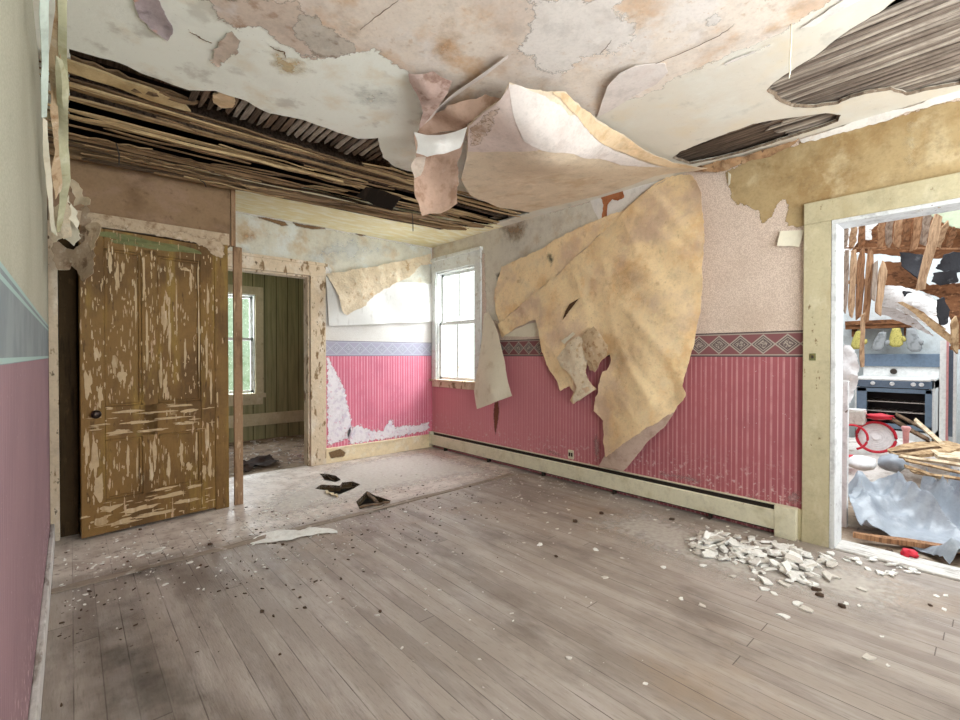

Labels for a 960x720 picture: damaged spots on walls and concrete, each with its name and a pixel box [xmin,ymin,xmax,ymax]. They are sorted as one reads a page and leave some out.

peeling [133,0,173,41]
peeling [210,0,356,67]
peeling [597,63,668,117]
spalling [673,0,960,173]
peeling [258,217,325,229]
peeling [590,180,661,219]
peeling [80,217,229,529]
peeling [326,357,430,458]